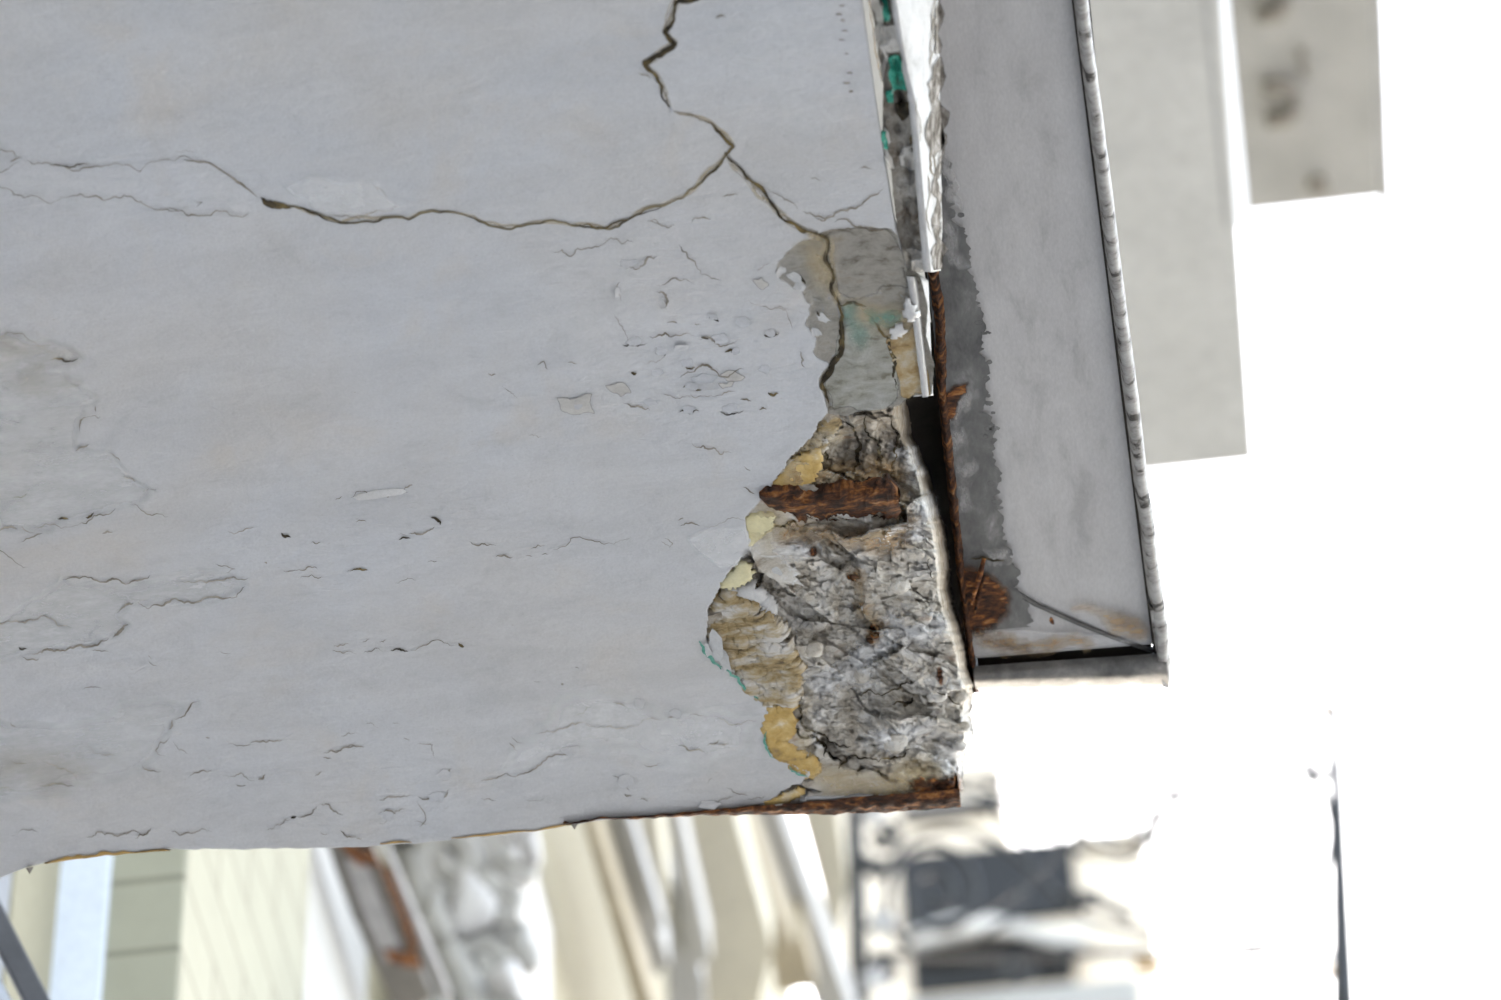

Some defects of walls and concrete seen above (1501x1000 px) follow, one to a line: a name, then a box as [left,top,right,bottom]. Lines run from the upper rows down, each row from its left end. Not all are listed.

crack [0,0,897,404]
spalling [26,849,170,874]
peeling [333,639,464,654]
spalling [482,0,1034,809]
rust [908,775,963,792]
rust [928,271,1085,693]